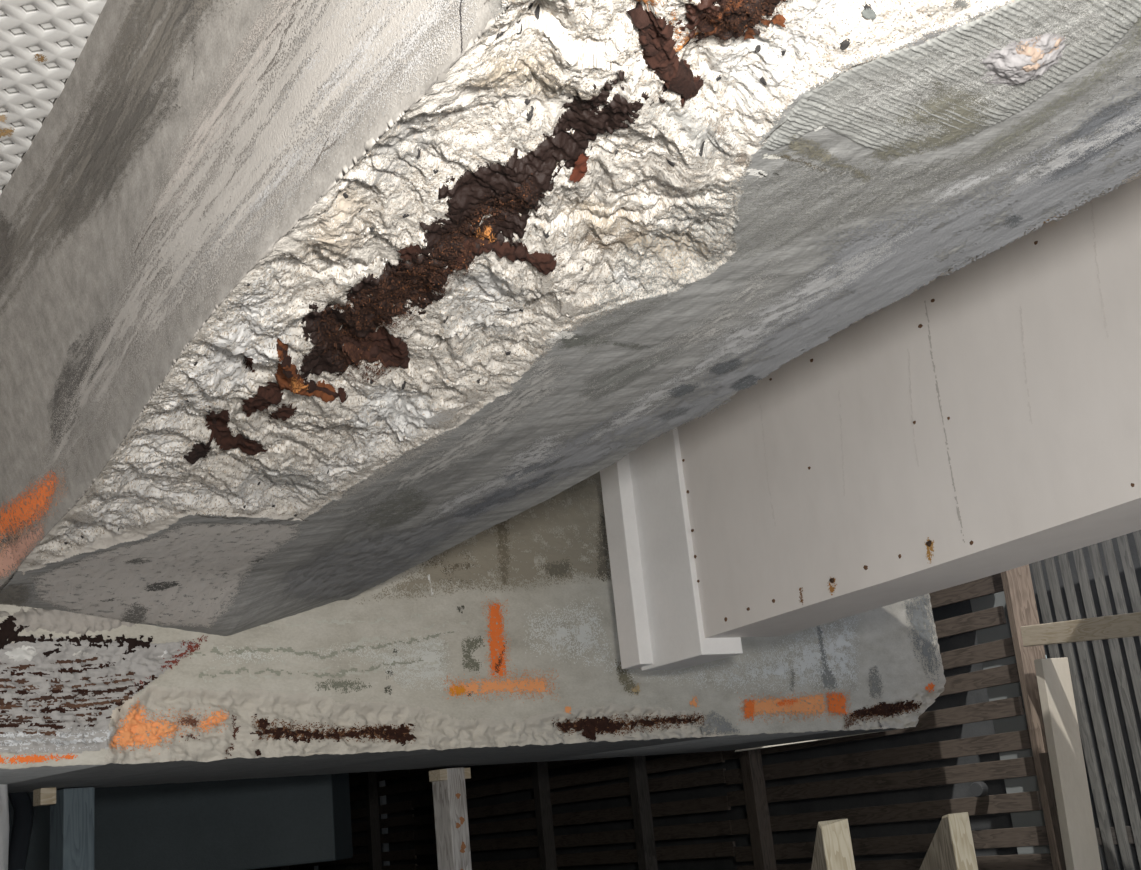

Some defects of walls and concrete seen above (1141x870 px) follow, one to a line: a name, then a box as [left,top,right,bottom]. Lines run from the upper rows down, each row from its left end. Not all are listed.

rust [183,0,799,465]
spalling [18,0,1009,575]
rust [0,616,208,736]
rust [225,714,417,759]
spalling [0,633,725,764]
rust [552,711,706,741]
rust [844,700,922,728]